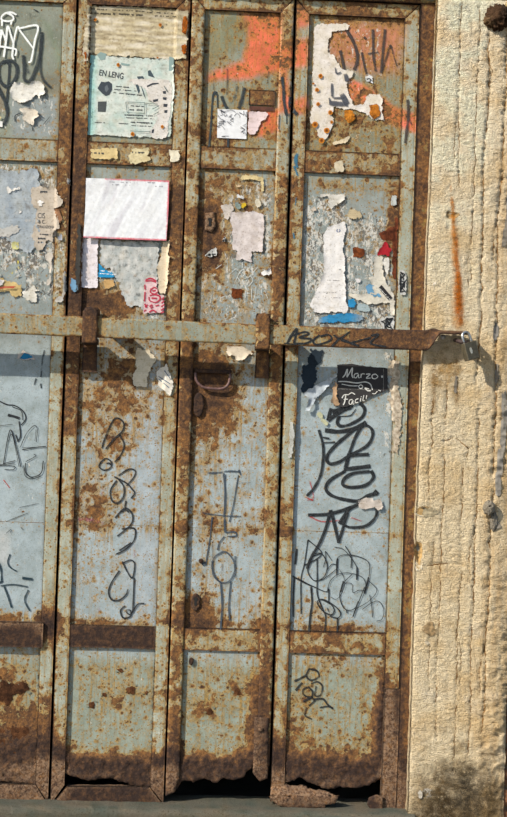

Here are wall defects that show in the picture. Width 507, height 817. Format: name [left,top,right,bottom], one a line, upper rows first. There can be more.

corrosion [452,200,462,325]
water stain [416,766,501,817]